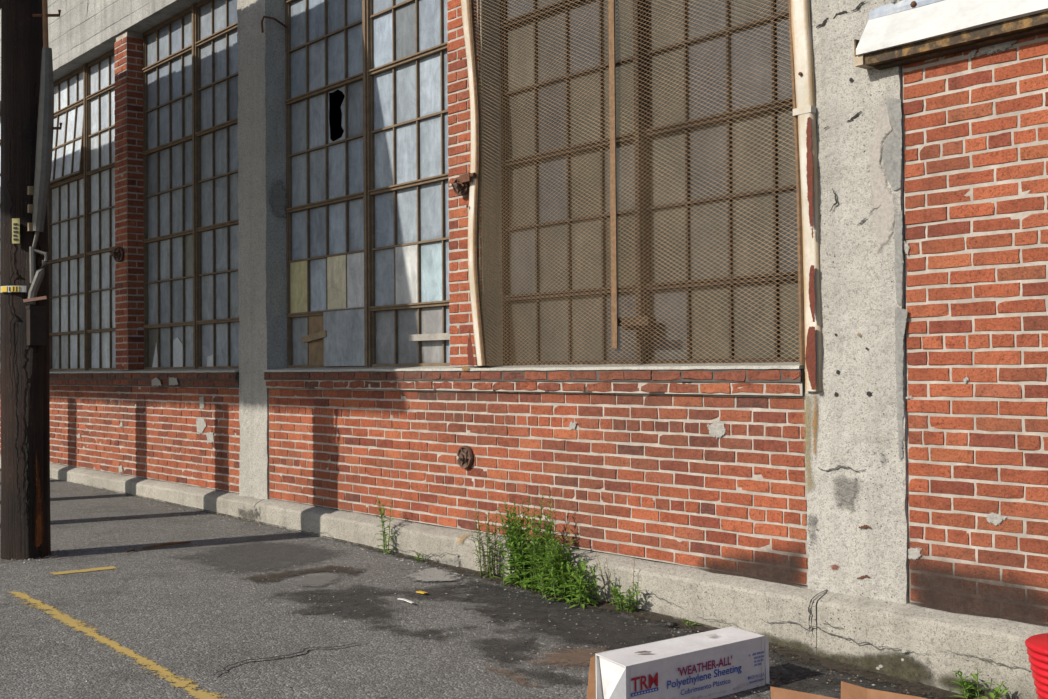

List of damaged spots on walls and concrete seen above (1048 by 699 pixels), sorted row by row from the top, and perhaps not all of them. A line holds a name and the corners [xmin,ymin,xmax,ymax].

crack [816,1,865,28]
crack [818,464,865,472]
damp [910,560,1048,627]
crack [634,589,1032,672]